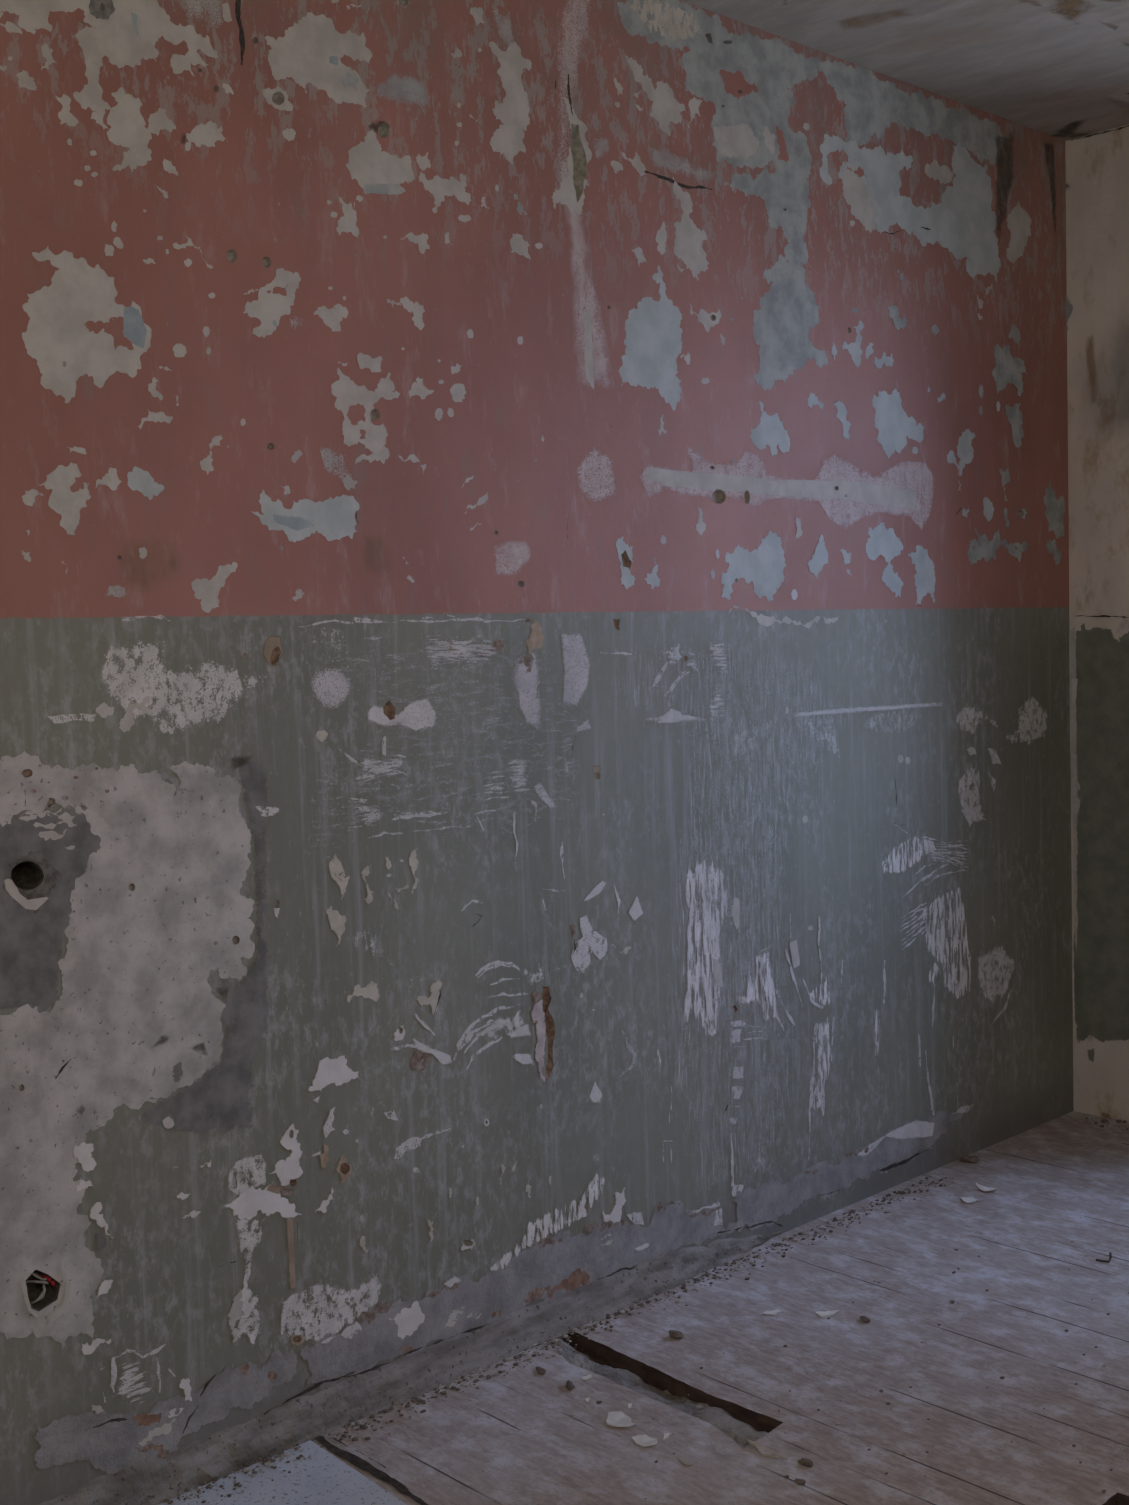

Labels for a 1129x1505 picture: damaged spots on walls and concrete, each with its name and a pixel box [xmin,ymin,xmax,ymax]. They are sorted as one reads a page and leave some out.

peeling [0,0,232,198]
peeling [22,221,187,430]
peeling [143,234,237,269]
peeling [243,257,349,338]
peeling [387,296,425,330]
peeling [552,0,1032,459]
peeling [251,352,466,551]
peeling [48,636,282,735]
peeling [1073,623,1129,1062]
flaking render [0,751,255,1355]
peeling [308,1055,360,1092]
flaking render [34,1104,977,1474]